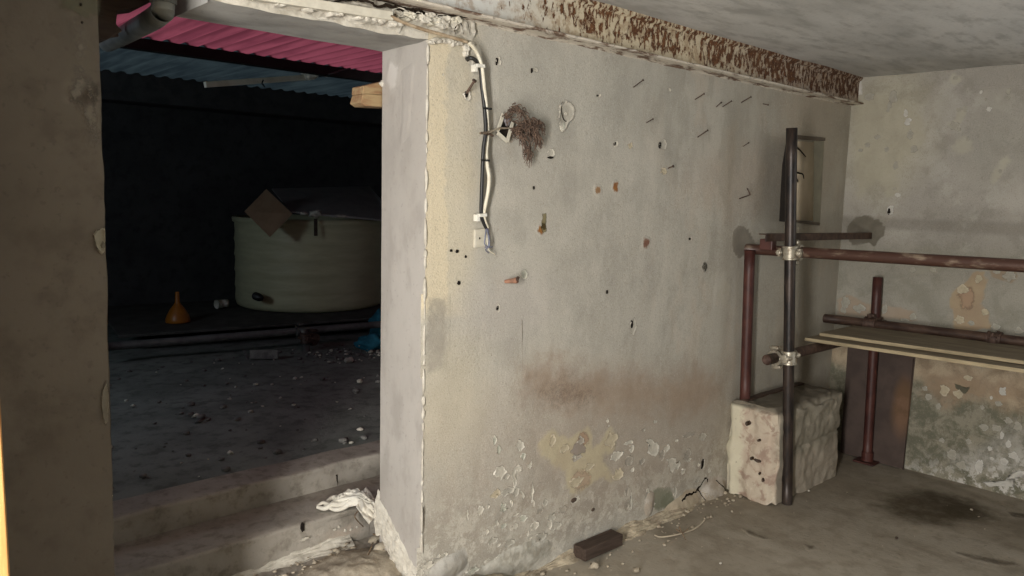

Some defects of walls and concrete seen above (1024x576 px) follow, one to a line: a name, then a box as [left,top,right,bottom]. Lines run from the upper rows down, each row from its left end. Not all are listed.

flaking render [255,0,717,576]
flaking render [835,292,922,325]
flaking render [948,270,1017,332]
water stain [498,332,735,436]
flaking render [911,360,1024,421]
crack [682,478,726,502]